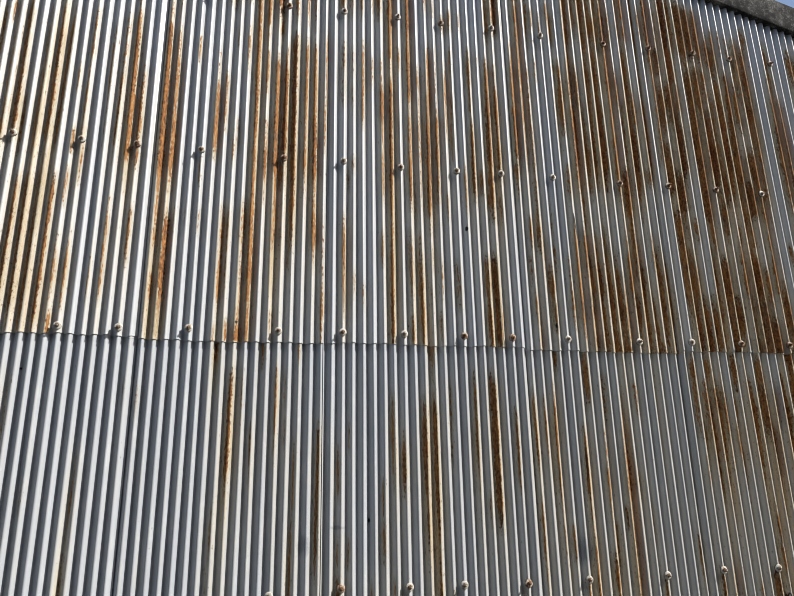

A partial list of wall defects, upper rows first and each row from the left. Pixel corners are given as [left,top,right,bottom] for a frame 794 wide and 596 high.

rust [0,0,79,333]
rust [101,1,149,170]
rust [148,0,186,339]
rust [212,0,459,381]
rust [460,50,504,223]
rust [483,252,504,347]
rust [505,0,794,519]
rust [271,363,295,596]
rust [310,422,322,580]
rust [379,397,410,566]
rust [421,398,455,596]
rust [487,372,505,535]